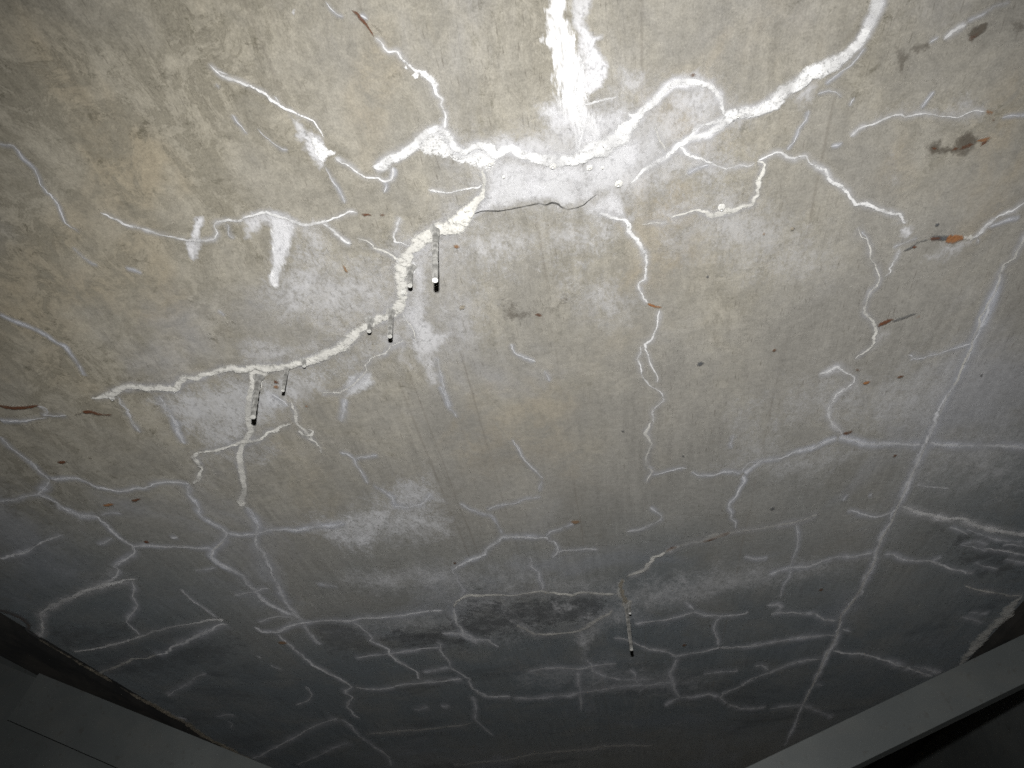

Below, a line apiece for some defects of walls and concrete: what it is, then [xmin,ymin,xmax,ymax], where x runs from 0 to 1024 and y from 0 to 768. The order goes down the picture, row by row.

crack [212,67,323,136]
crack [327,4,447,128]
crack [14,146,74,229]
crack [102,157,394,244]
water stain [92,0,886,529]
crack [672,93,1024,224]
rust [931,224,973,243]
crack [1,314,85,375]
rust [0,405,64,422]
crack [256,196,1024,739]
crack [0,437,344,663]